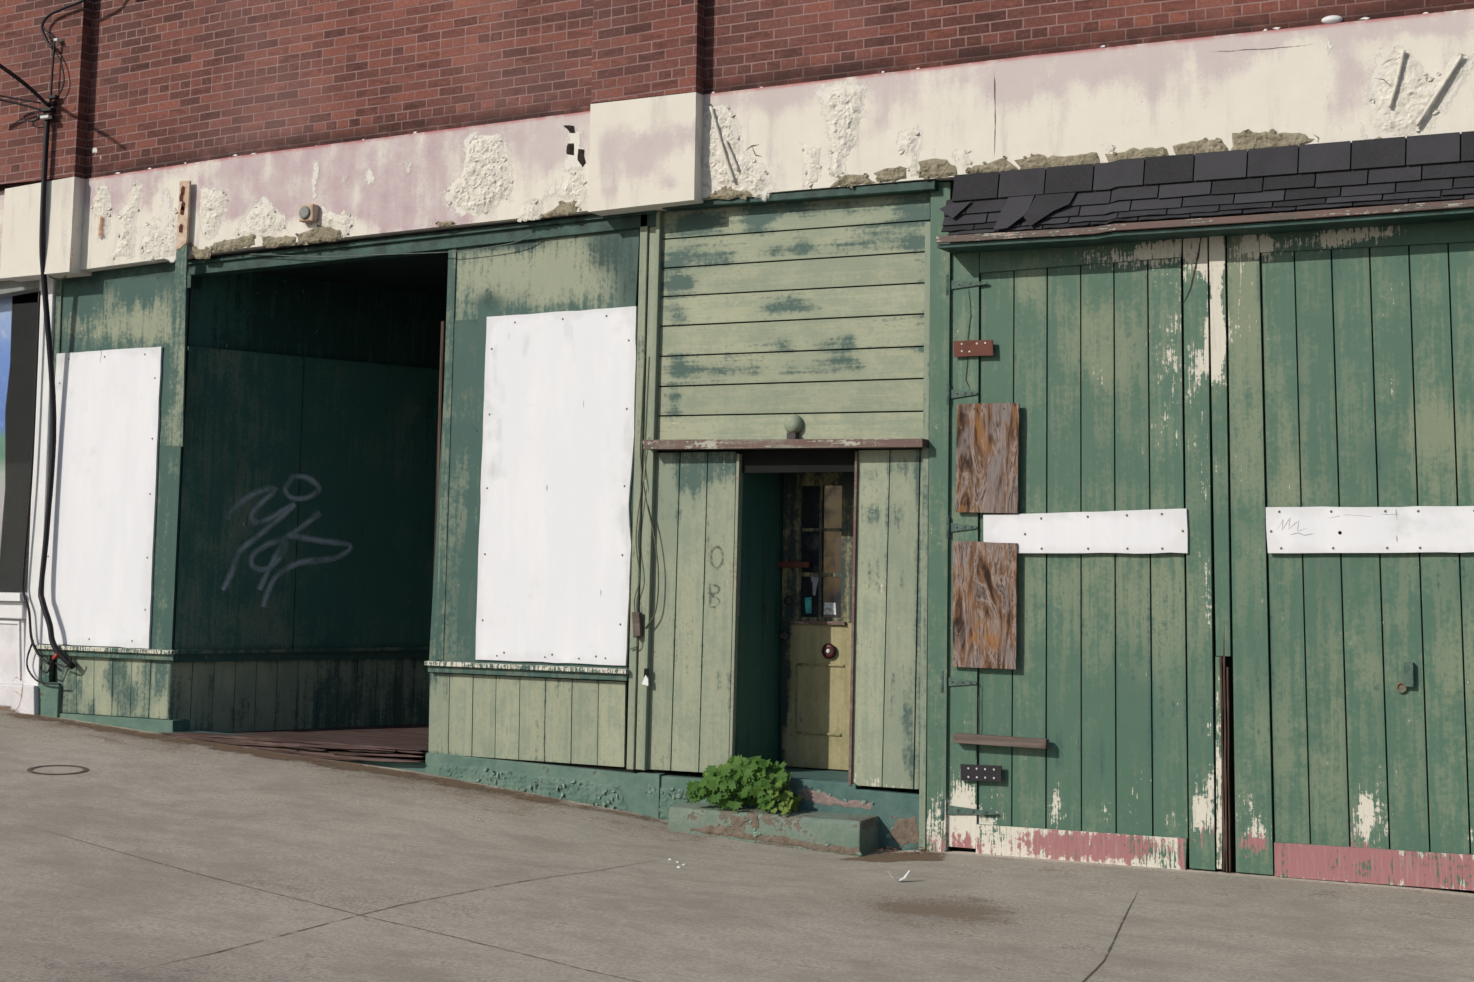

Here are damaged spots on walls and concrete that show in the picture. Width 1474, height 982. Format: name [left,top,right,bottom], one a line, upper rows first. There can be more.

spalling [1361,45,1474,139]
spalling [90,181,354,262]
spalling [435,131,587,227]